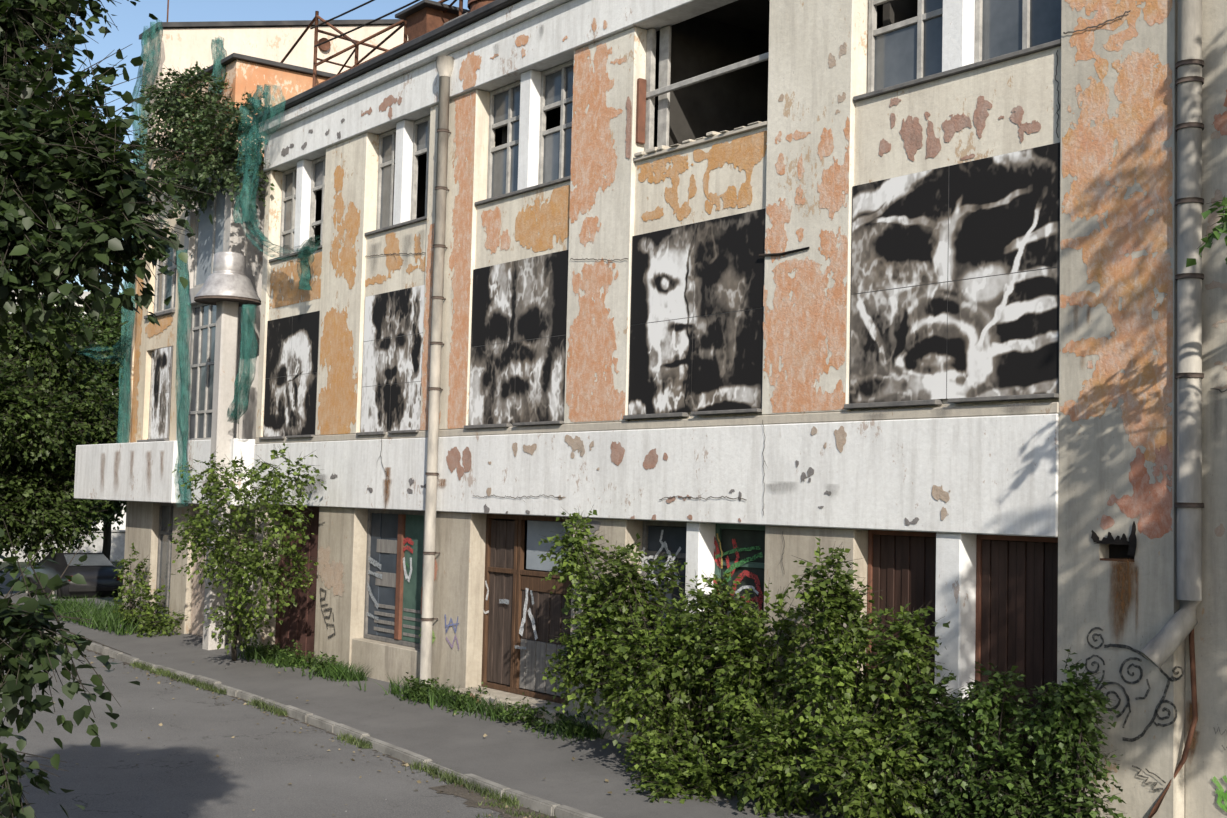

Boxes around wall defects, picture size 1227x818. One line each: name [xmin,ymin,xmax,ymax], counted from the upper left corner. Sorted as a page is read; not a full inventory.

peeling [879,95,1041,161]
peeling [269,18,850,458]
peeling [1059,0,1173,539]
peeling [1206,189,1227,237]
peeling [446,447,471,480]
spalling [596,441,625,470]
spalling [643,449,668,470]
rust [1111,560,1138,630]